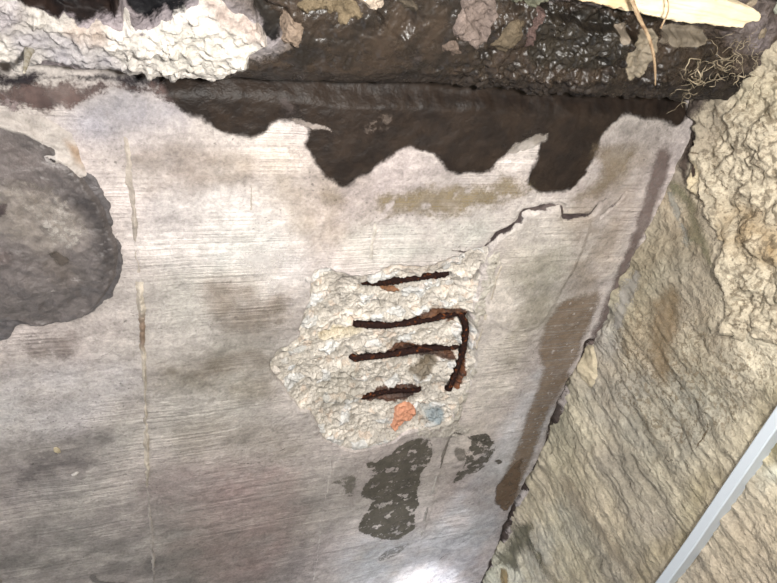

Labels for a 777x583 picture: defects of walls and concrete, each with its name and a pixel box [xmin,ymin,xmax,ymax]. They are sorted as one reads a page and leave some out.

leakage [0,0,751,193]
crack [485,203,616,246]
leakage [50,252,69,266]
spalling [270,246,503,450]
rust [381,341,467,389]
rust [417,307,467,321]
leakage [454,150,688,511]
rust [366,384,418,402]
leakage [334,438,433,561]